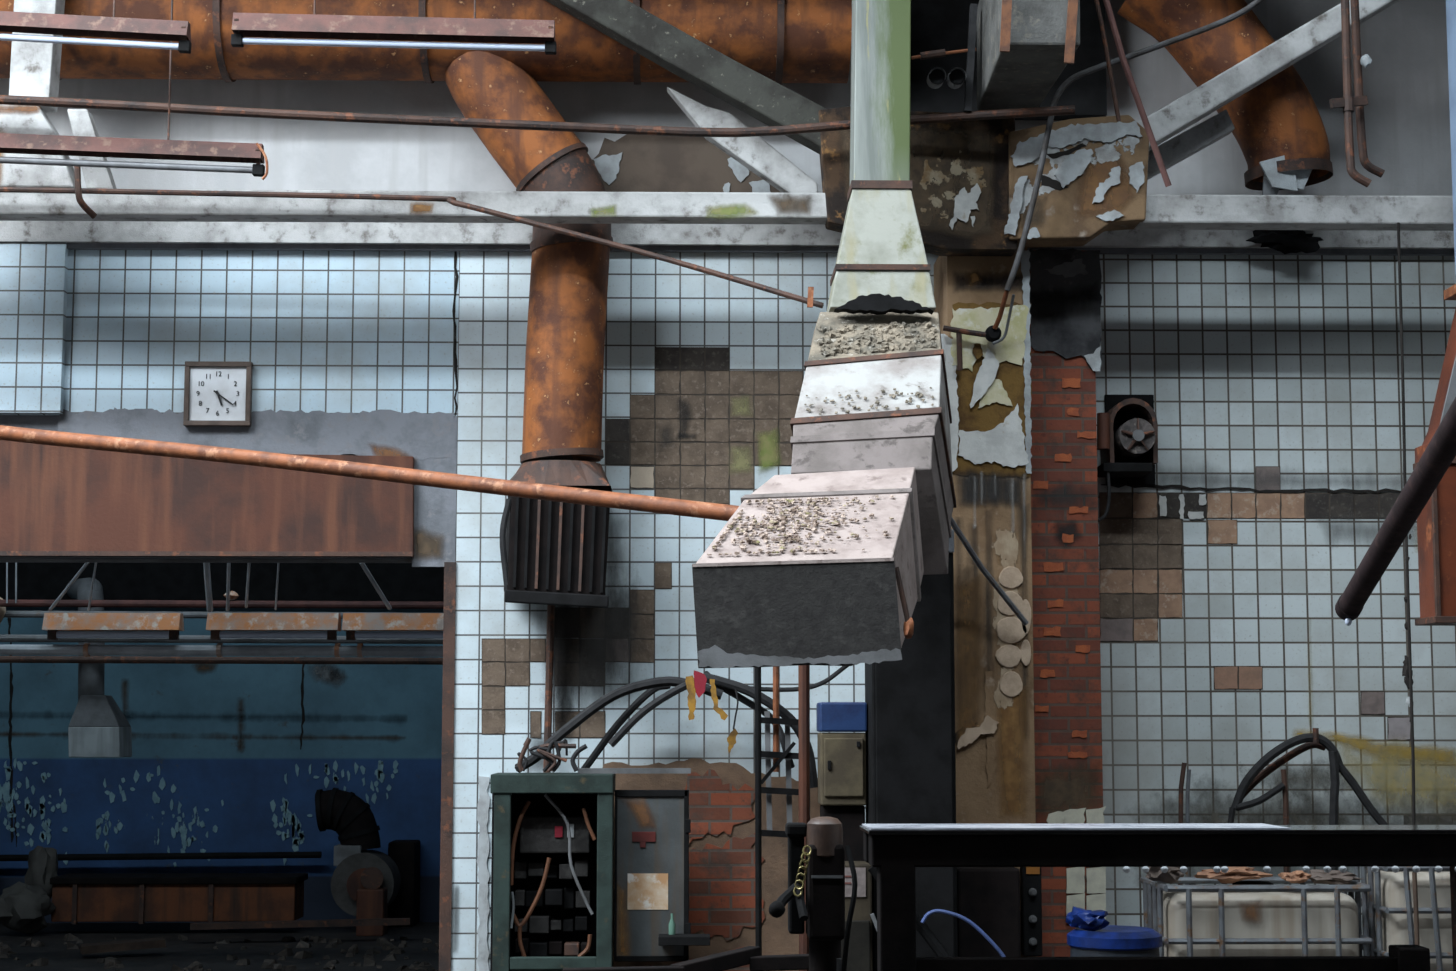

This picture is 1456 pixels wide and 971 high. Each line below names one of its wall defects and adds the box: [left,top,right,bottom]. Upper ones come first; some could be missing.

peeling [944,121,1145,489]
peeling [605,347,803,504]
peeling [992,528,1021,649]
peeling [1069,466,1400,653]
spalling [955,667,1014,787]
peeling [0,758,68,847]
peeling [96,766,224,867]
peeling [270,760,398,865]
water stain [862,767,1456,830]
peeling [1403,815,1456,825]